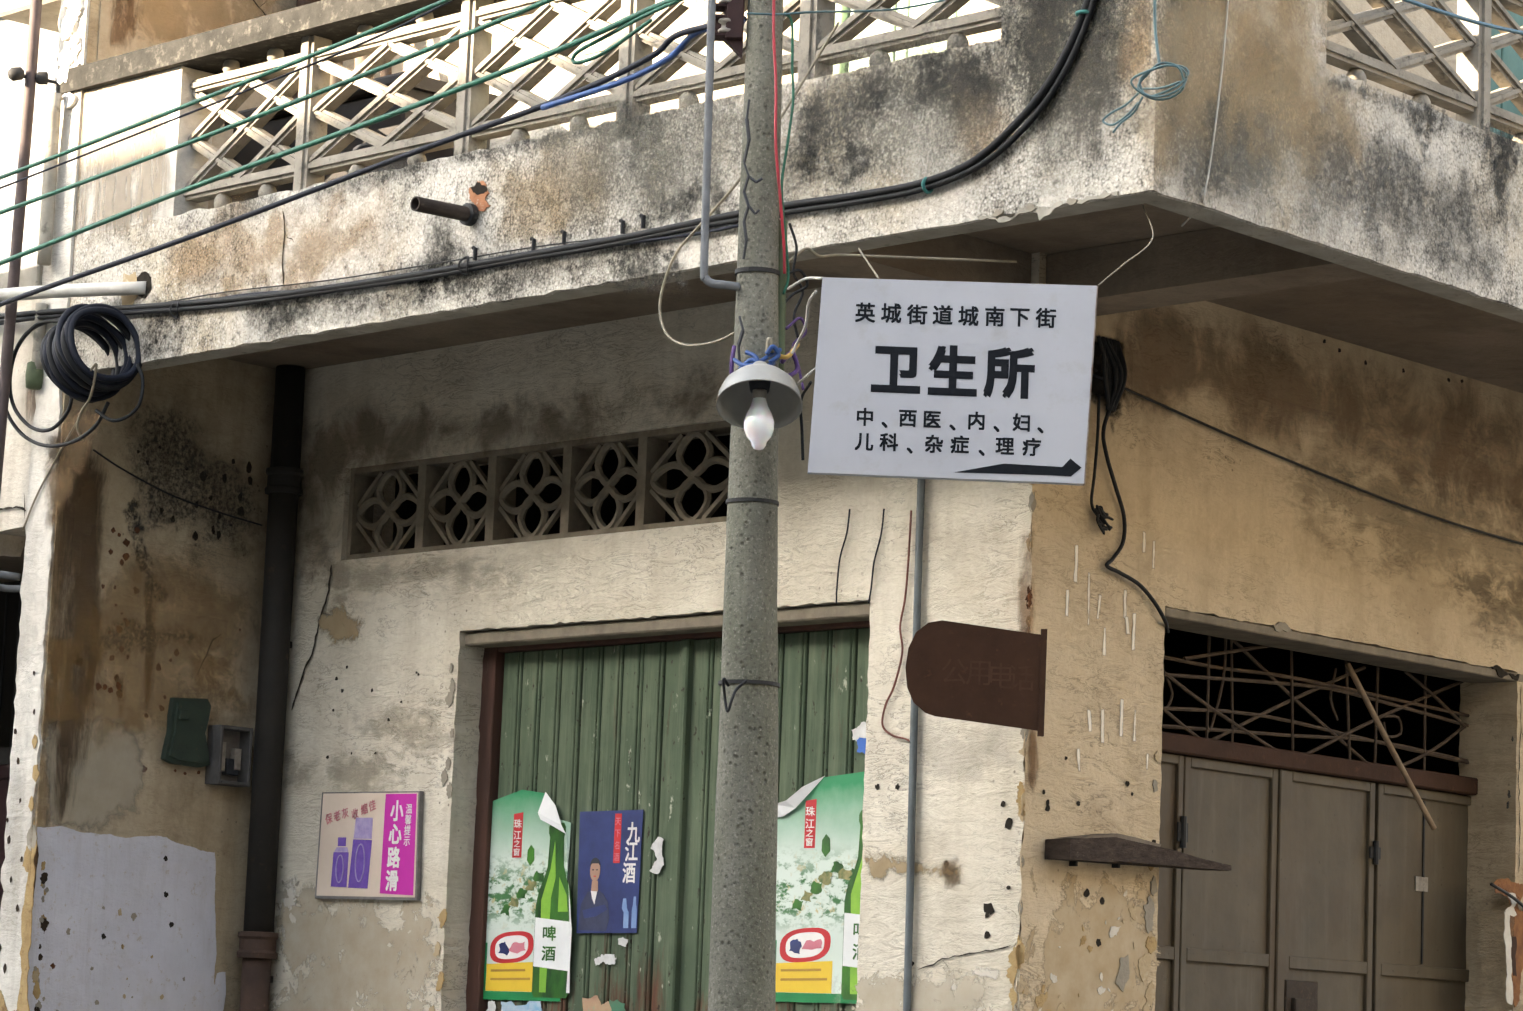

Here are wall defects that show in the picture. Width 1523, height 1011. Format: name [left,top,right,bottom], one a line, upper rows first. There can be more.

damp [787,0,1141,192]
damp [1317,81,1518,280]
damp [124,406,256,694]
spalling [1028,483,1037,512]
damp [49,451,103,819]
crack [291,565,332,710]
flaking render [0,729,59,1011]
flaking render [851,961,993,1011]
spalling [1016,781,1026,822]
flaking render [1006,855,1161,1011]
rust [1494,878,1523,1011]